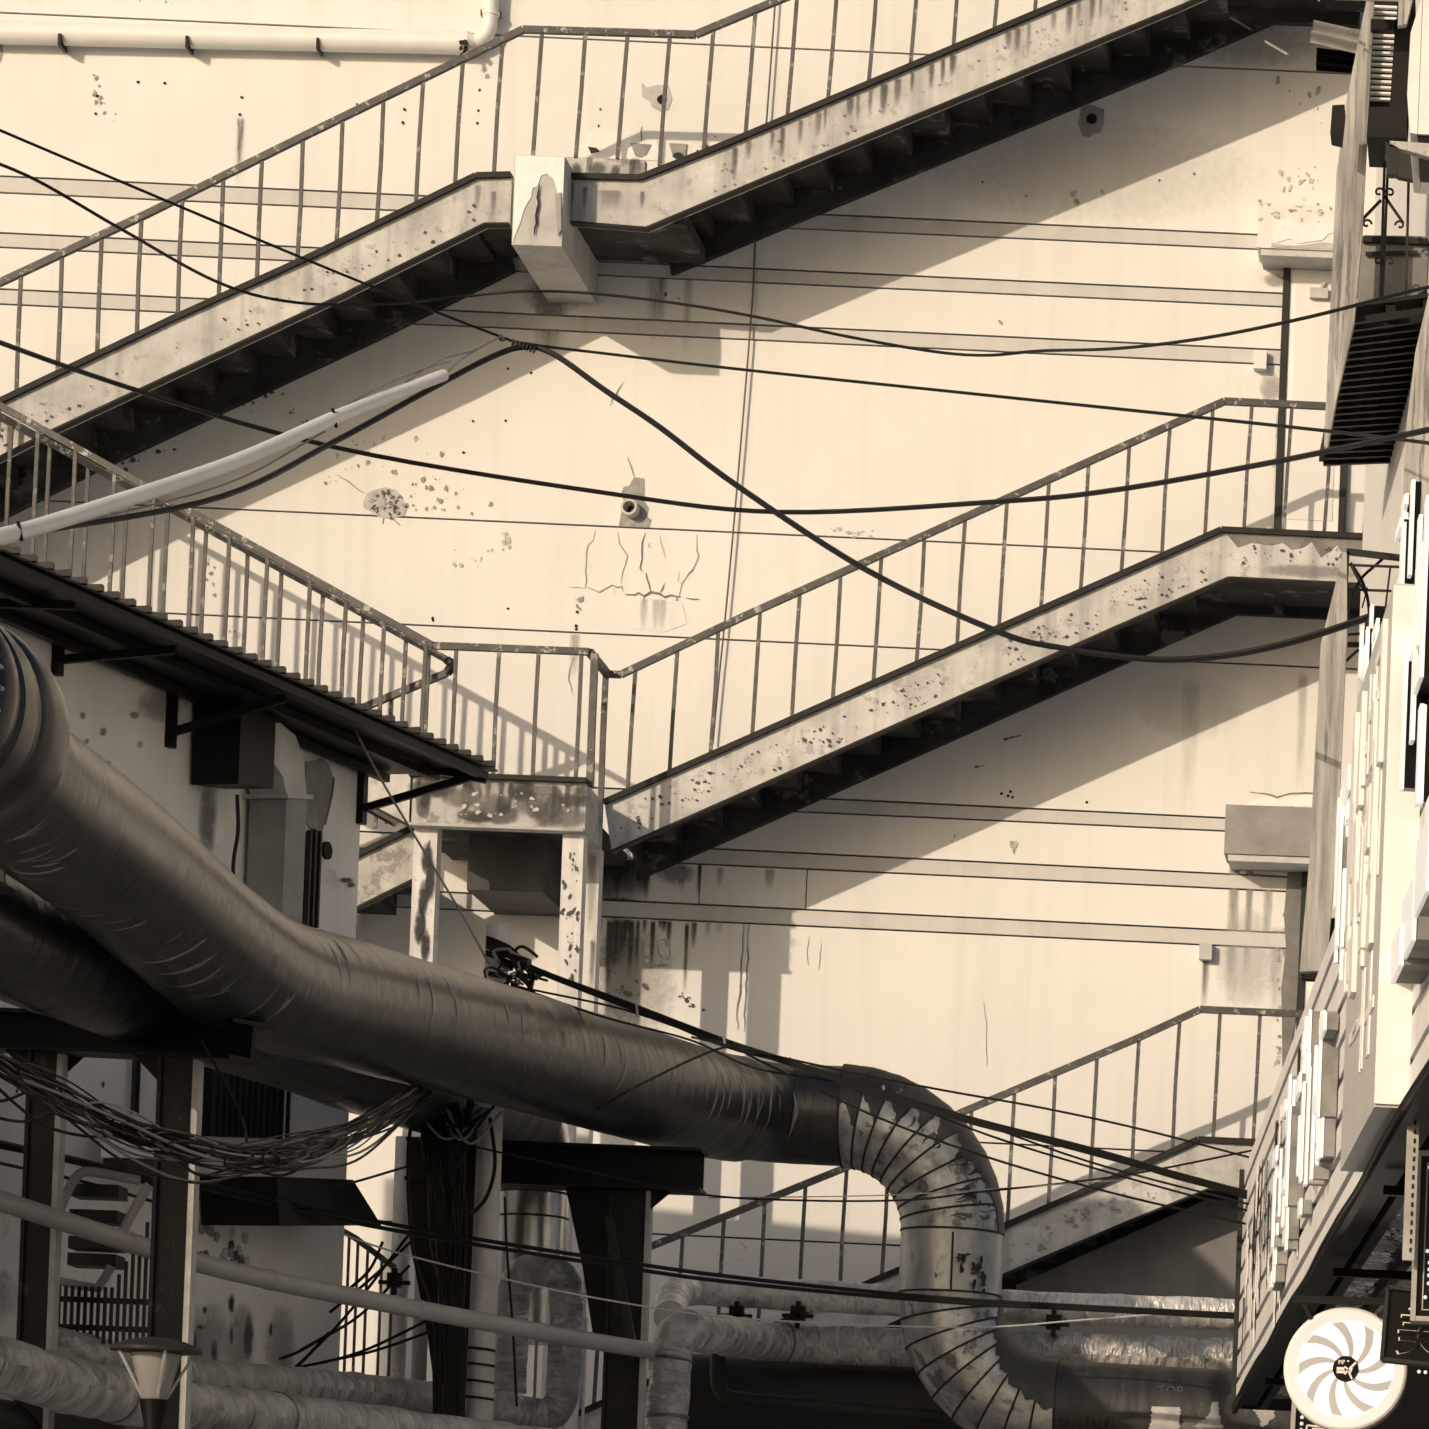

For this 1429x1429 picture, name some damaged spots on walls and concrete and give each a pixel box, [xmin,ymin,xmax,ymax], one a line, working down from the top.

corrosion [870,55,955,114]
crack [574,532,700,633]
corrosion [1110,570,1207,609]
corrosion [1007,613,1097,665]
corrosion [869,673,944,713]
corrosion [613,715,857,834]
peeling [460,791,539,818]
leakage [1228,854,1309,932]
leakage [602,861,702,1000]